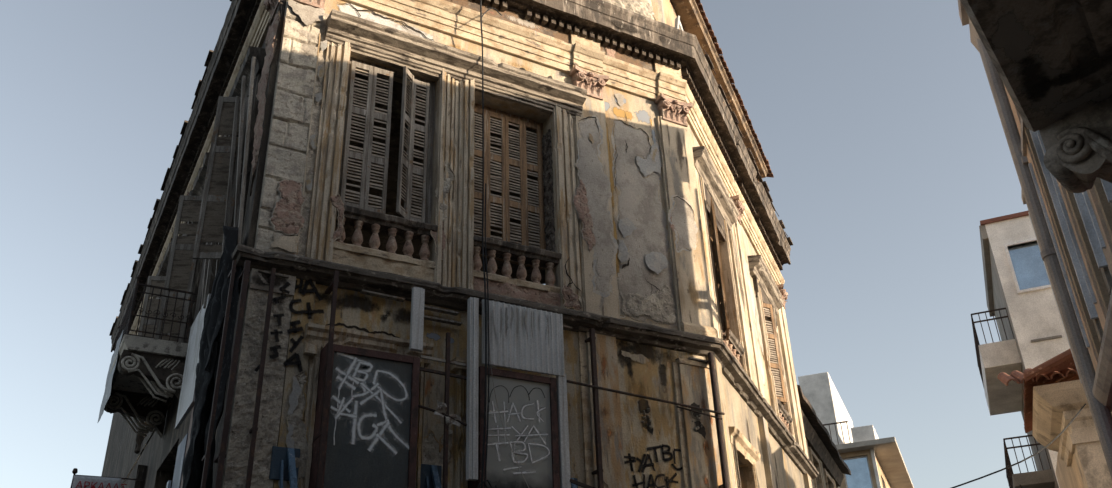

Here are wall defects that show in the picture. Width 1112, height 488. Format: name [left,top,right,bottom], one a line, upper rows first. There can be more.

flaking render [603,0,656,20]
flaking render [250,0,435,255]
flaking render [604,93,698,327]